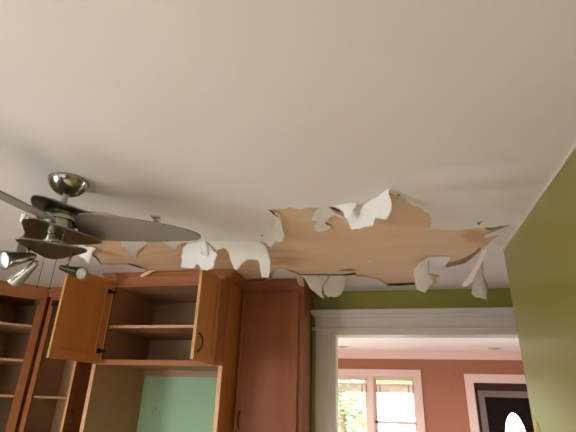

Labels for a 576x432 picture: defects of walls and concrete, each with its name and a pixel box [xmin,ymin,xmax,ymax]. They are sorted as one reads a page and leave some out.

peeling [78,187,488,301]